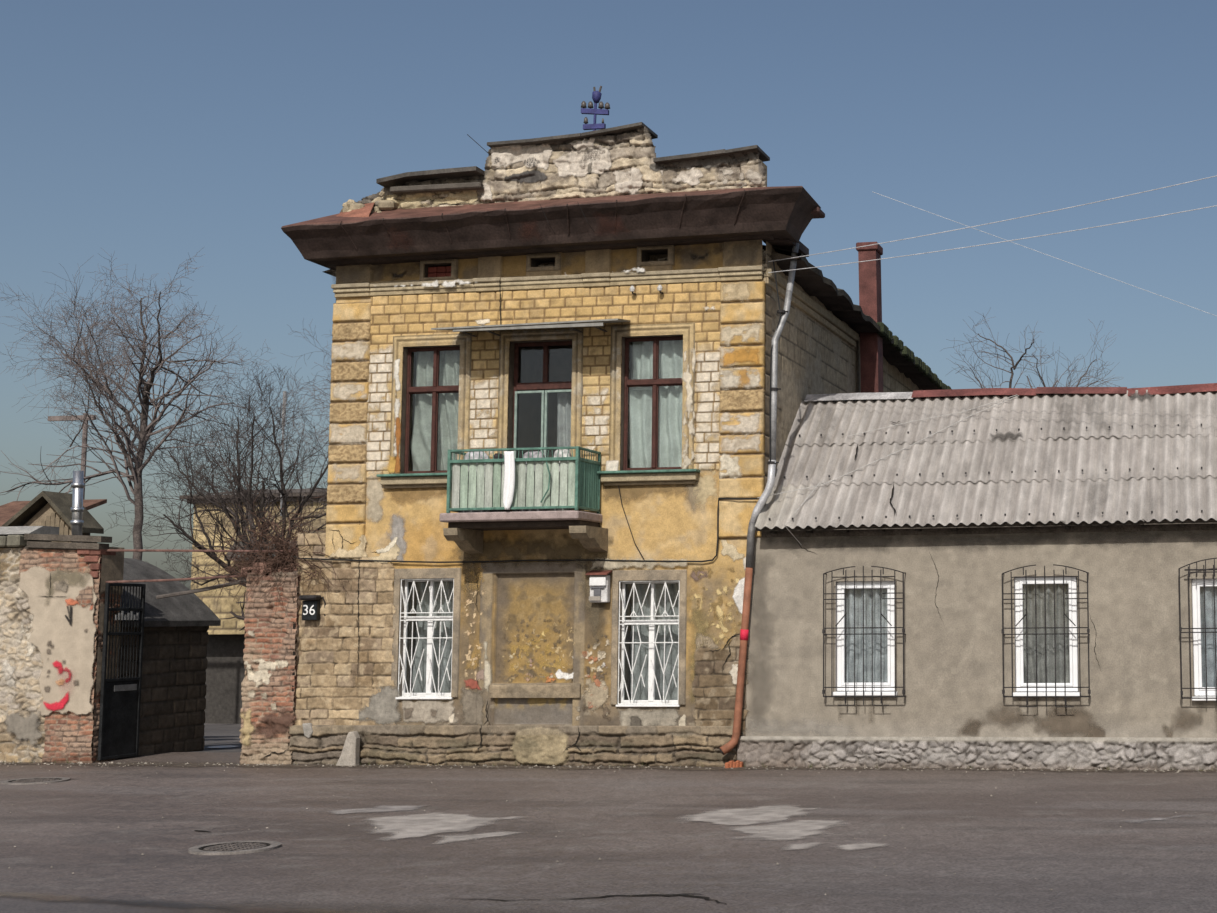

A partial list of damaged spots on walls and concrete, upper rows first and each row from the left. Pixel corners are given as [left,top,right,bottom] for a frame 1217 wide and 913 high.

peeling [330,341,400,522]
peeling [19,566,97,715]
spalling [240,532,413,746]
spalling [431,591,610,725]
spalling [591,539,749,736]
leakage [962,708,1024,735]
leakage [1040,705,1105,737]
leakage [1168,712,1195,737]